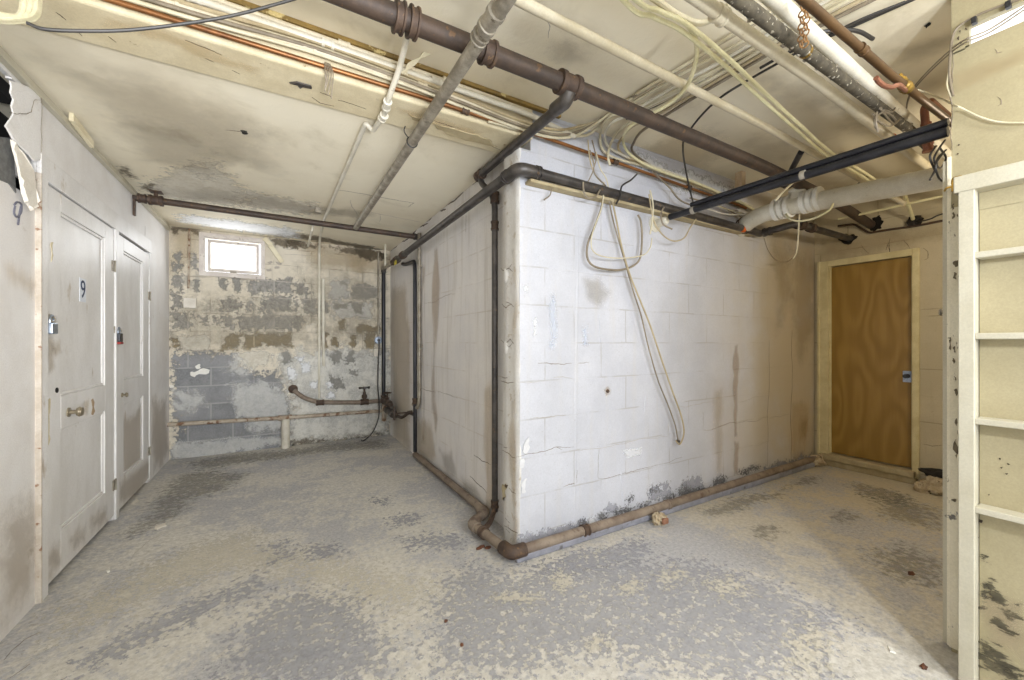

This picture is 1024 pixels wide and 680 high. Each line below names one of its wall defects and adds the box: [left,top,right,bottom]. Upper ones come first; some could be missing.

peeling [169,251,381,460]
water stain [570,453,814,527]
water stain [978,578,1024,636]
water stain [978,639,1024,680]